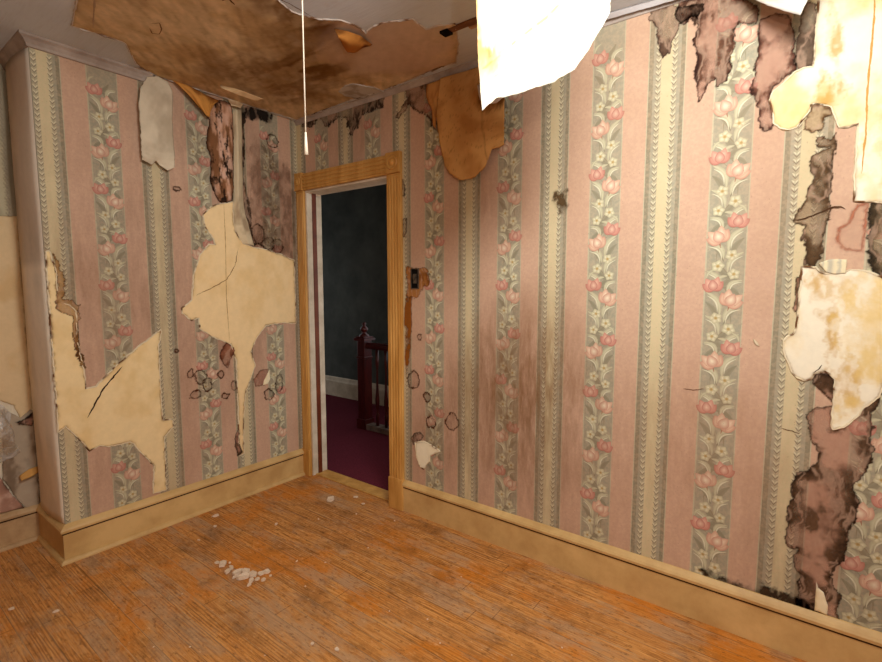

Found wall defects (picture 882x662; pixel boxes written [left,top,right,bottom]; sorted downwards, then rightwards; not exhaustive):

flaking render [71,0,460,120]
flaking render [768,0,882,204]
flaking render [44,250,174,494]
flaking render [181,201,296,456]
flaking render [411,432,440,469]
water stain [760,365,882,619]
flaking render [782,265,882,430]